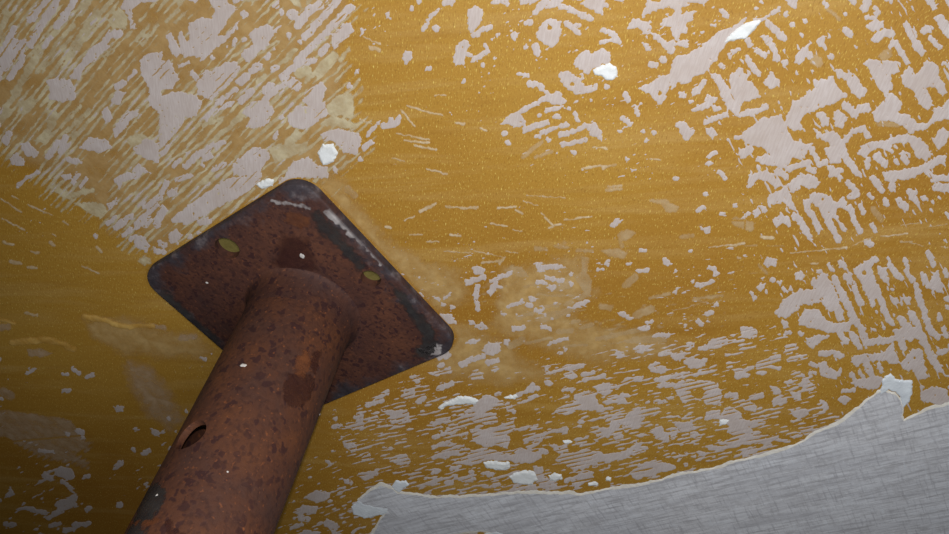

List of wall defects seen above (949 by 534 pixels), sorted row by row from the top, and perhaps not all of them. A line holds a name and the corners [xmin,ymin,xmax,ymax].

peeling [0,0,402,255]
corrosion [277,238,314,269]
peeling [278,0,949,534]
peeling [61,366,95,379]
peeling [0,441,93,534]
peeling [131,416,177,490]